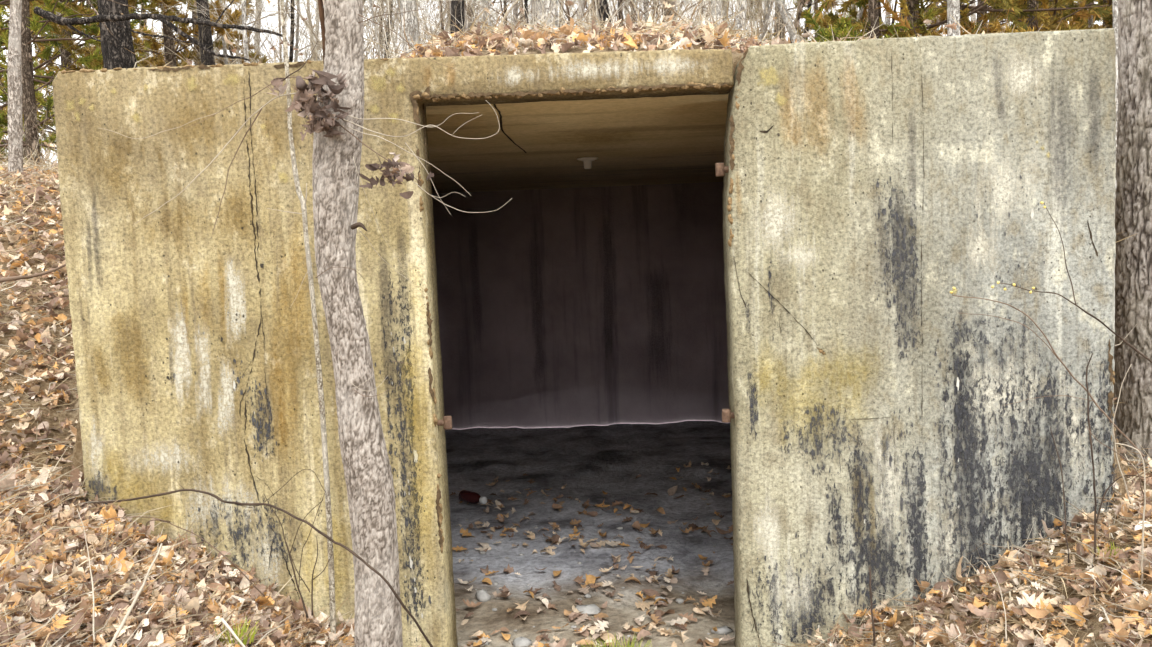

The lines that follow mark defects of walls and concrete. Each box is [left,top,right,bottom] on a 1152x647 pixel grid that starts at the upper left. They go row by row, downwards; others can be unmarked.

crack [236,71,300,600]
leakage [974,365,1034,425]
leakage [1054,402,1086,462]
leakage [91,436,103,479]
leakage [875,439,900,514]
leakage [186,484,253,530]
leakage [252,533,277,577]
leakage [758,510,778,554]
leakage [777,572,809,611]